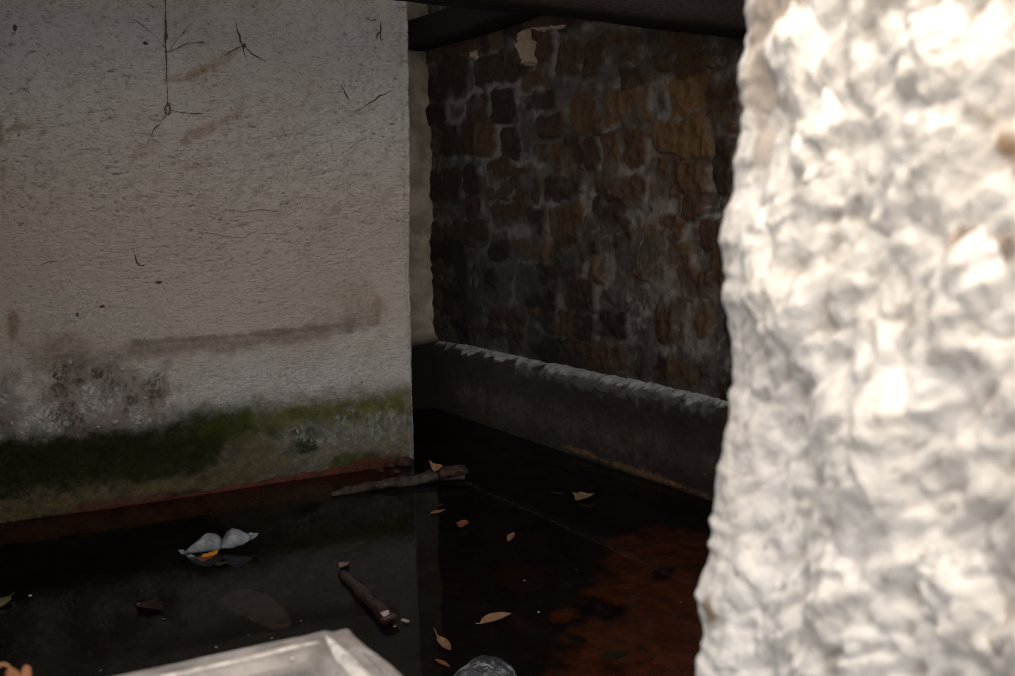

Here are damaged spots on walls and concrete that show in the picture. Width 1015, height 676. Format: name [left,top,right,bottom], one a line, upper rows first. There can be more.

crack [225,19,265,62]
flaking render [515,24,566,66]
water stain [0,413,249,490]